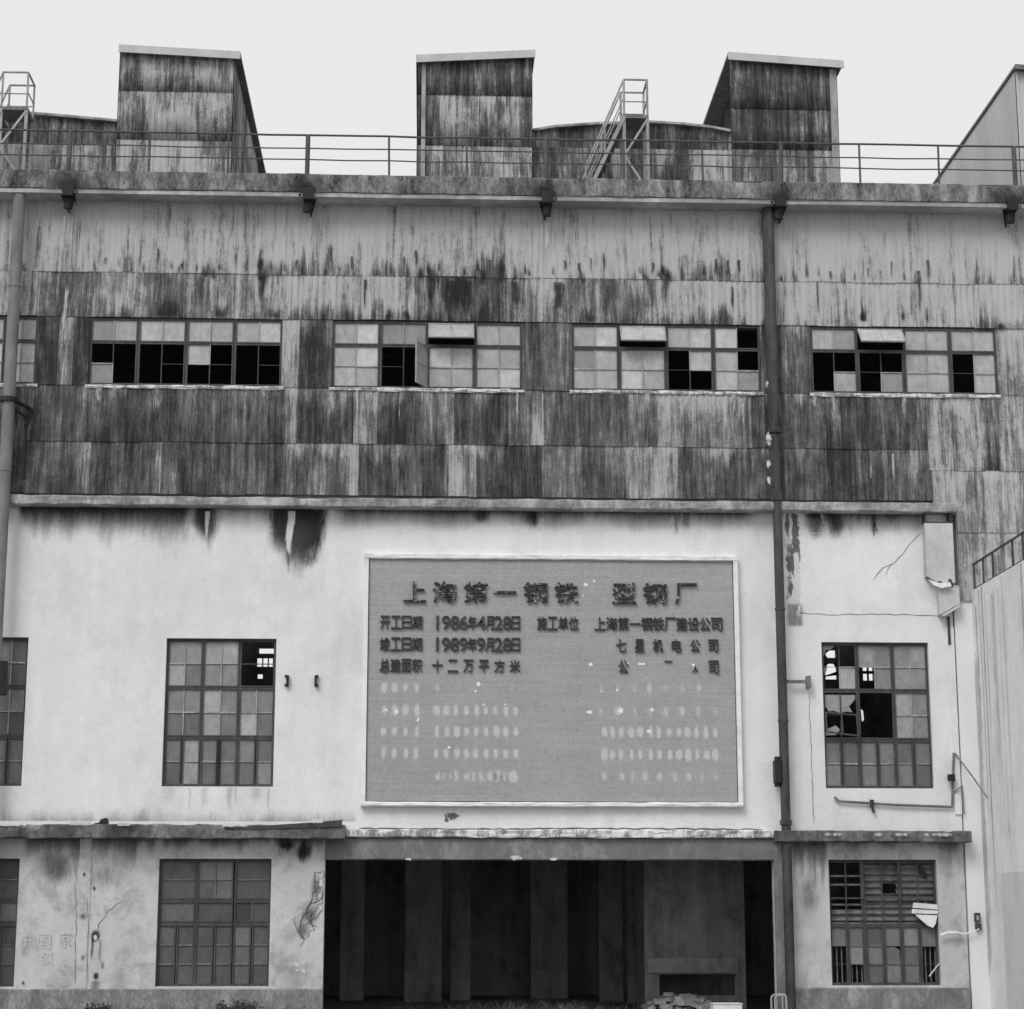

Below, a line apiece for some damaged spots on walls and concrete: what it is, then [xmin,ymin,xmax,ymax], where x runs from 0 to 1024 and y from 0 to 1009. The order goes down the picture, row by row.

leakage [427,276,471,310]
leakage [542,275,565,307]
leakage [649,279,669,303]
leakage [21,507,217,539]
leakage [270,509,327,561]
peeling [782,514,801,625]
crack [75,865,121,979]
crack [292,871,325,947]